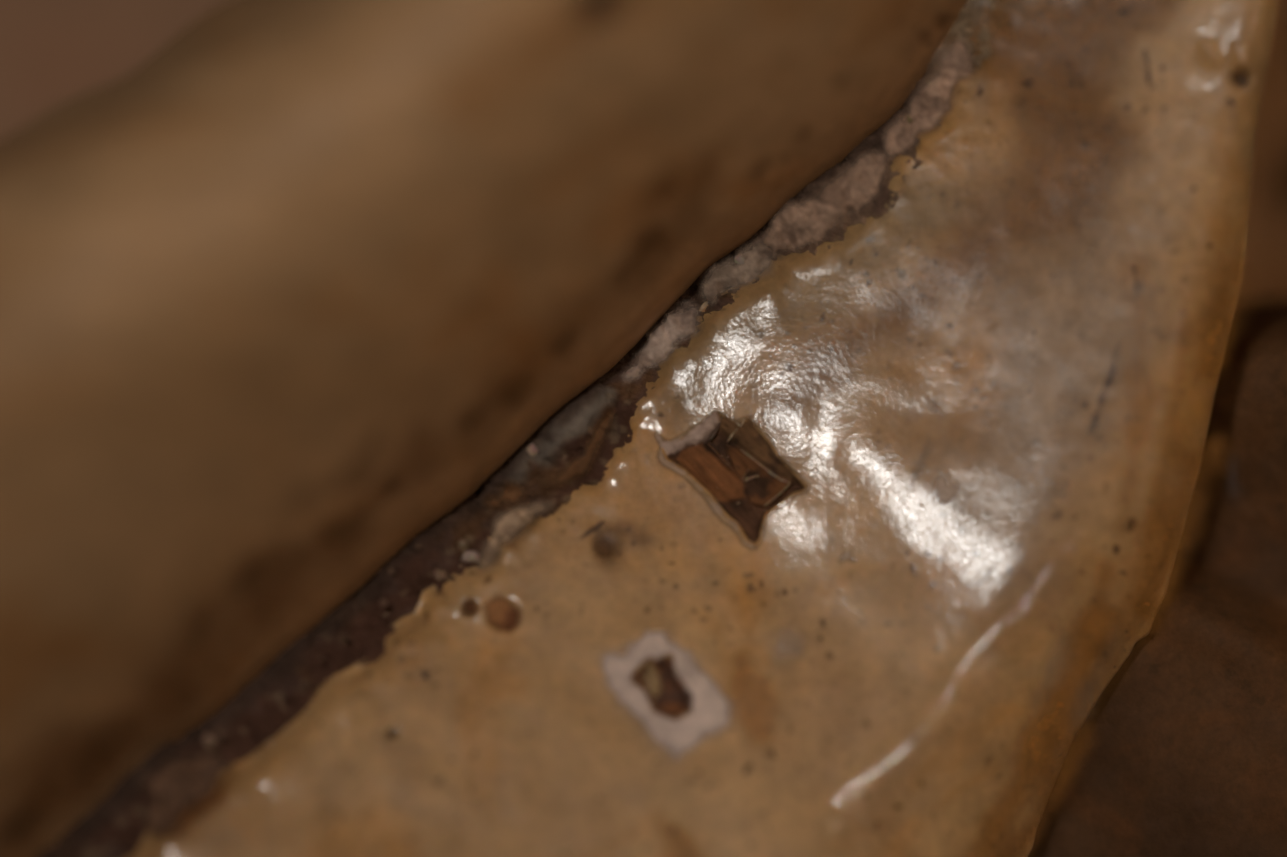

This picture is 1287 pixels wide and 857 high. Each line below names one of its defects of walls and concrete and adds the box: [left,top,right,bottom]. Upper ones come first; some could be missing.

crack [582,521,604,538]
spalling [654,410,810,549]